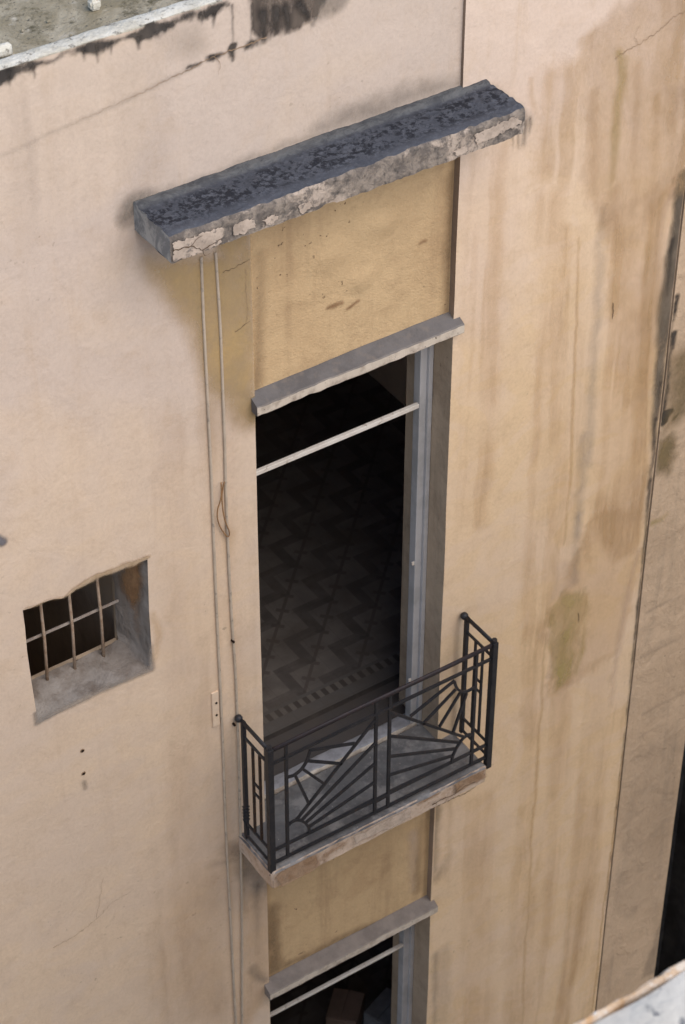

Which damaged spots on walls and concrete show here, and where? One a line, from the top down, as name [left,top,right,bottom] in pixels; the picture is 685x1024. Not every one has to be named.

damp [76,2,226,54]
damp [252,0,325,38]
damp [0,60,54,85]
crack [68,37,267,127]
peeling [173,214,278,262]
damp [639,133,685,494]